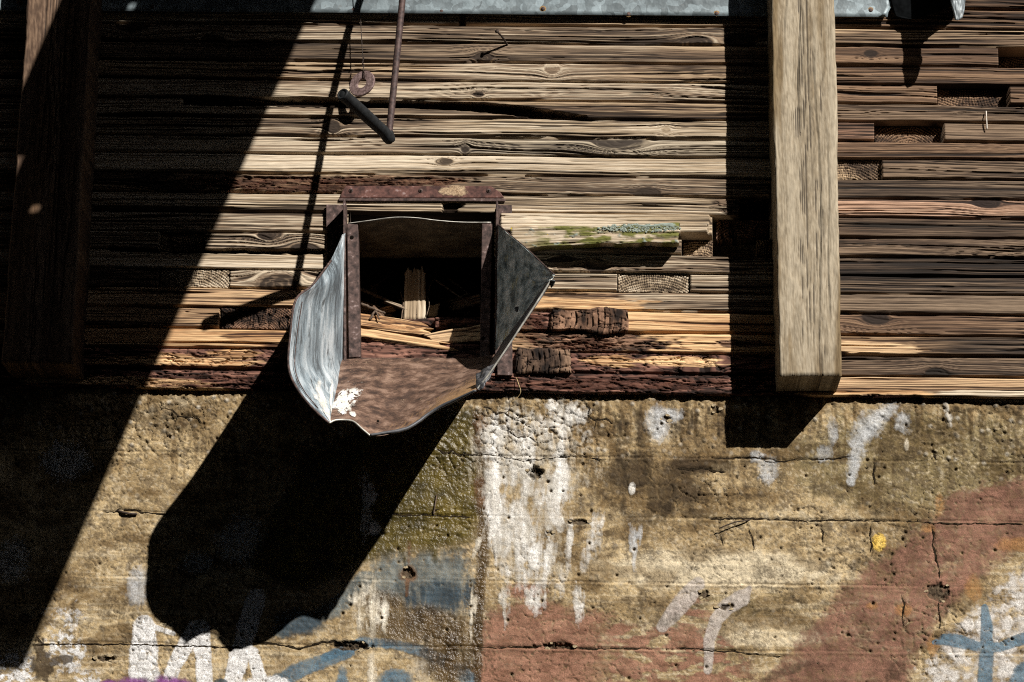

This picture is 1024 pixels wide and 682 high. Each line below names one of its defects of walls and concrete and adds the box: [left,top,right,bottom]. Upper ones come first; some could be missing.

water stain [850,406,893,485]
water stain [353,400,582,682]
crack [707,517,1022,629]
crack [32,637,369,650]